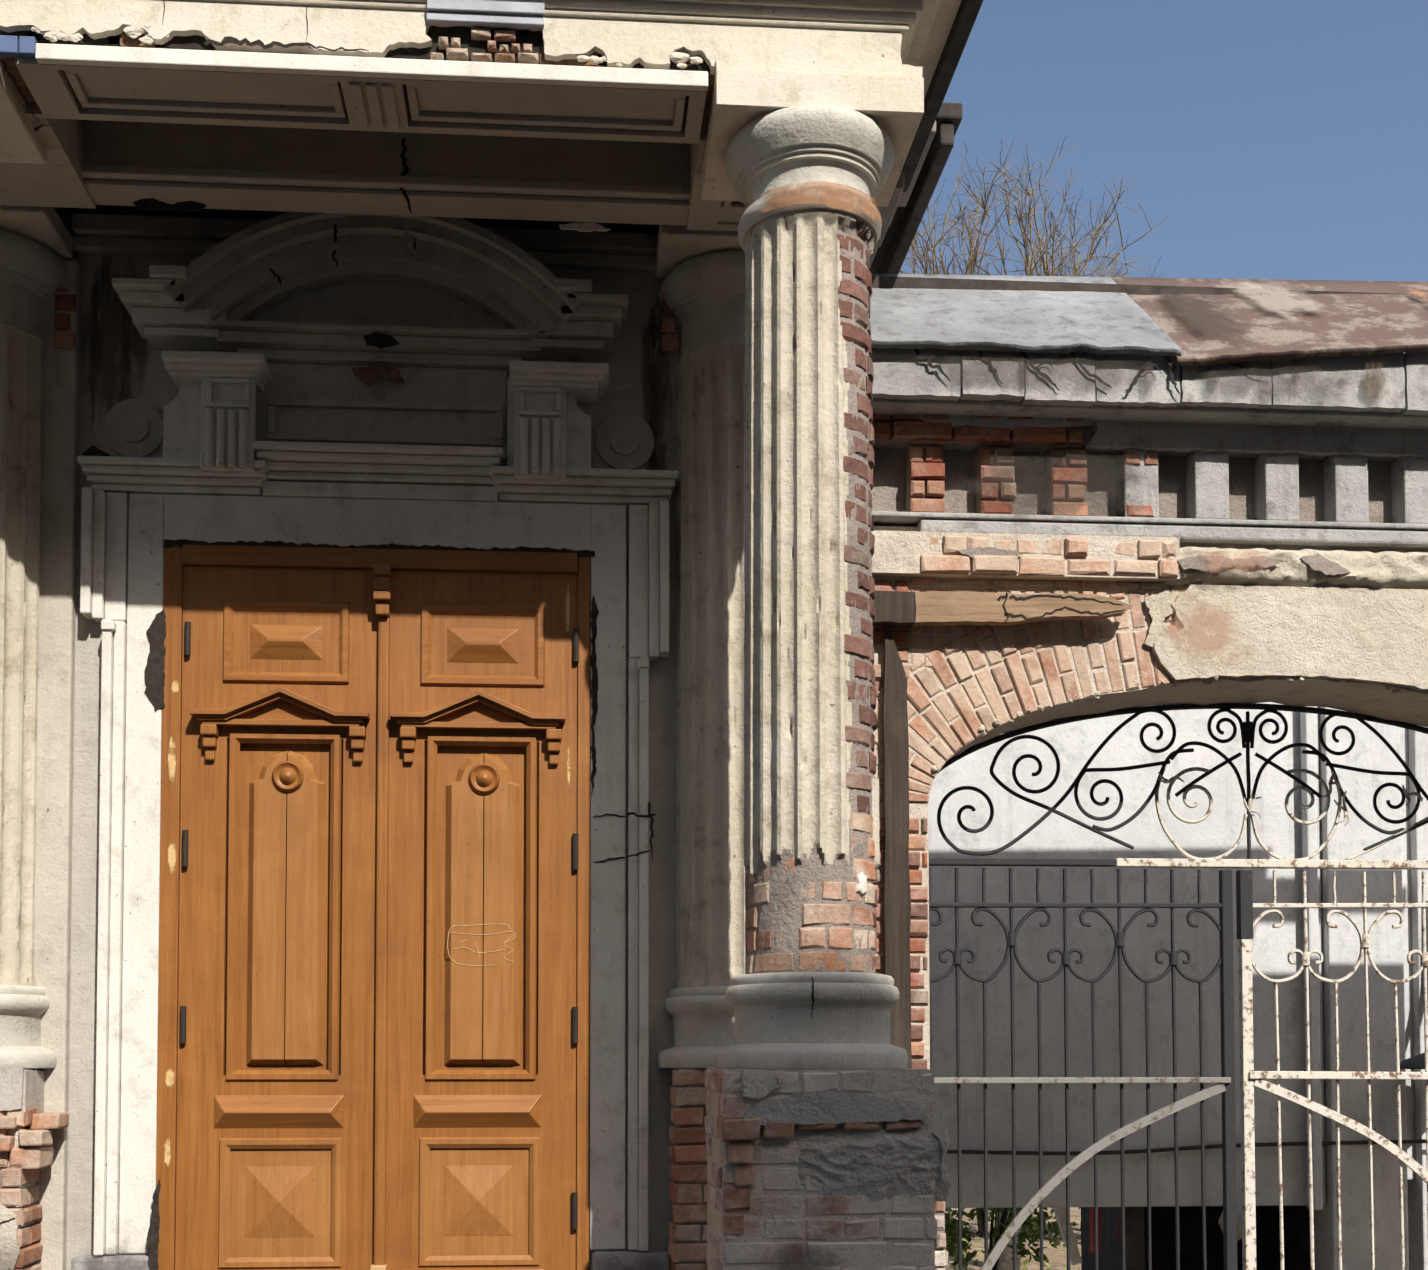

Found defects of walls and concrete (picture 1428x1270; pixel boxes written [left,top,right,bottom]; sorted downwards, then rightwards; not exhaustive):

peeling [123,24,155,45]
flaking render [427,25,542,64]
peeling [577,55,625,67]
crack [399,138,421,255]
crack [331,224,339,266]
crack [915,349,1183,396]
flaking render [745,181,882,974]
spalling [1177,555,1283,572]
spalling [1300,553,1351,576]
spalling [144,608,166,712]
crack [593,802,656,863]
spalling [717,1115,921,1235]